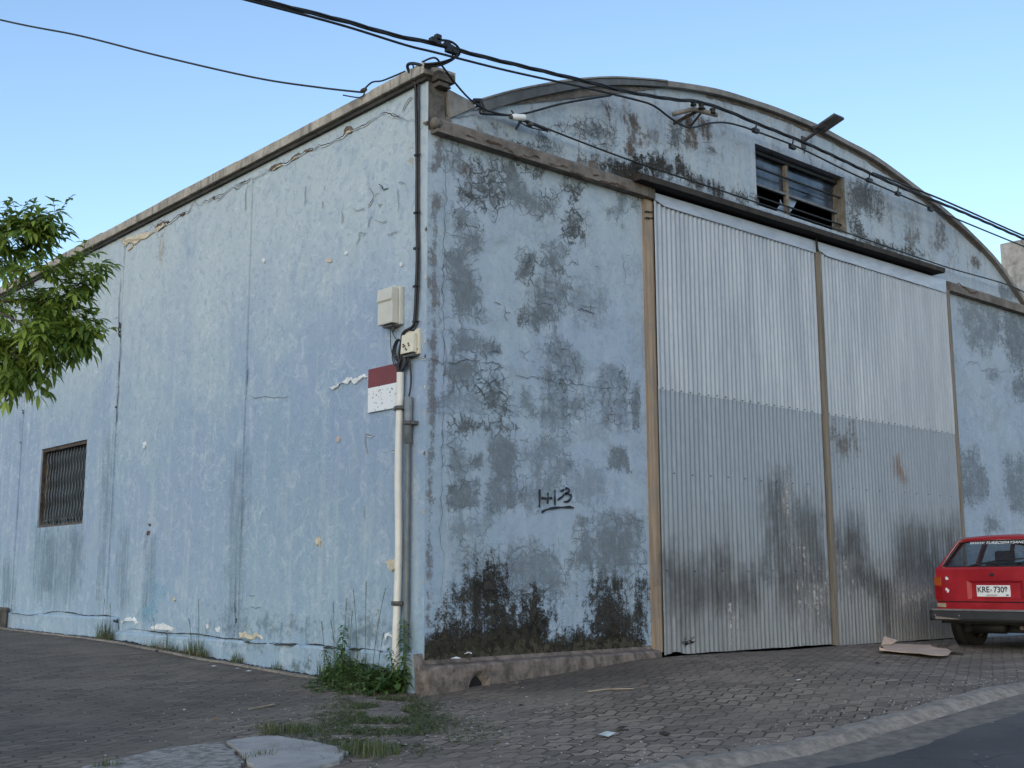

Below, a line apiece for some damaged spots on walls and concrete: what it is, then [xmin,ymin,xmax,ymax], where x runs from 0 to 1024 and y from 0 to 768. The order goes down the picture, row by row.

spalling [269,149,313,171]
crack [452,113,630,190]
mould [557,118,759,206]
peeling [119,212,185,251]
damp [846,177,925,258]
damp [441,144,587,514]
peeling [330,374,368,390]
crack [415,149,627,620]
damp [631,387,641,429]
damp [424,512,651,660]
peeling [151,623,174,631]
peeling [239,631,263,640]